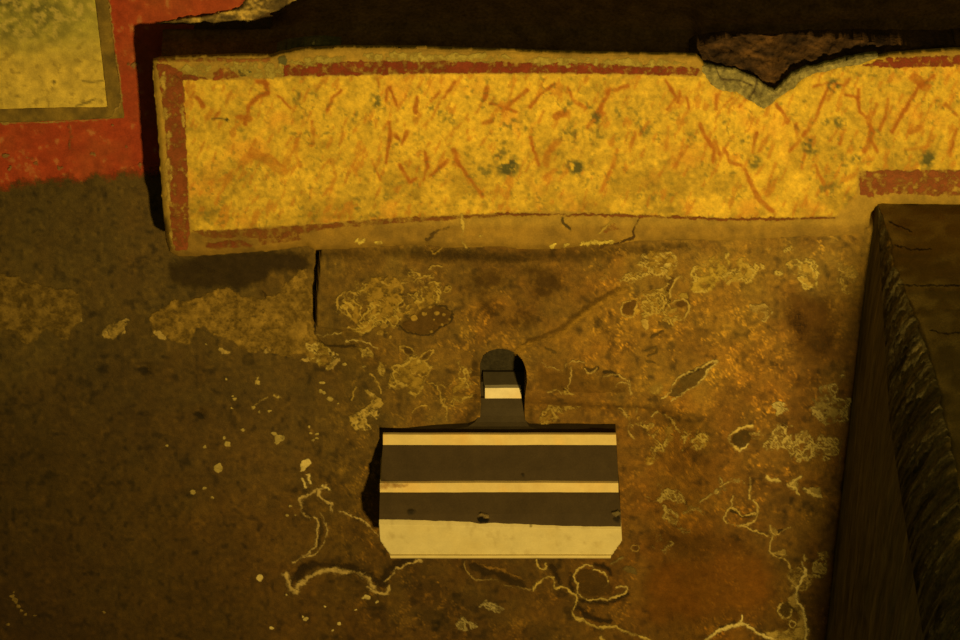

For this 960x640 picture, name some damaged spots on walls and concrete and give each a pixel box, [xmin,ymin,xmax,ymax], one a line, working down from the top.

spalling [689,28,960,109]
peeling [149,270,347,404]
crack [313,251,378,349]
peeling [336,230,442,309]
spalling [729,424,754,452]